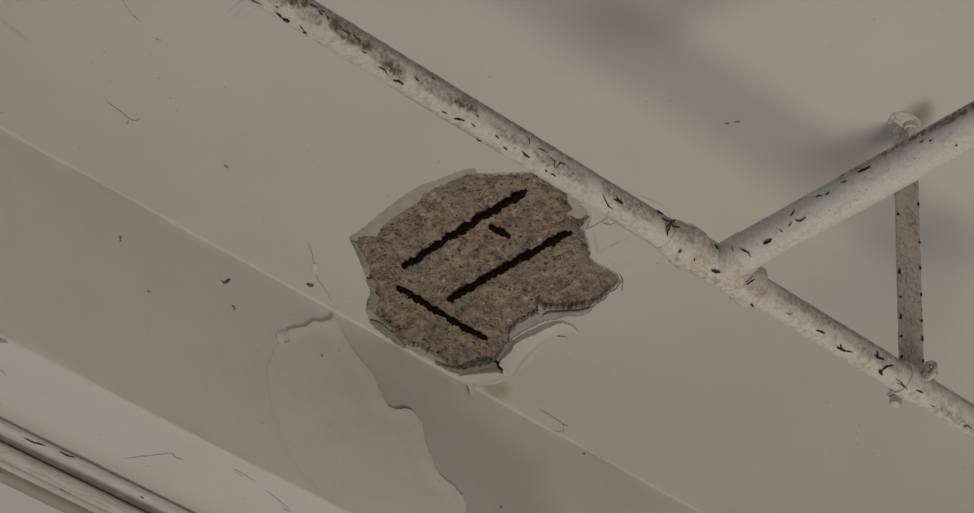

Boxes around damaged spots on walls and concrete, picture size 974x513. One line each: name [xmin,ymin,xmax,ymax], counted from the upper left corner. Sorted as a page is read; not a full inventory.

spalling [350,138,623,386]
peeling [267,315,466,513]